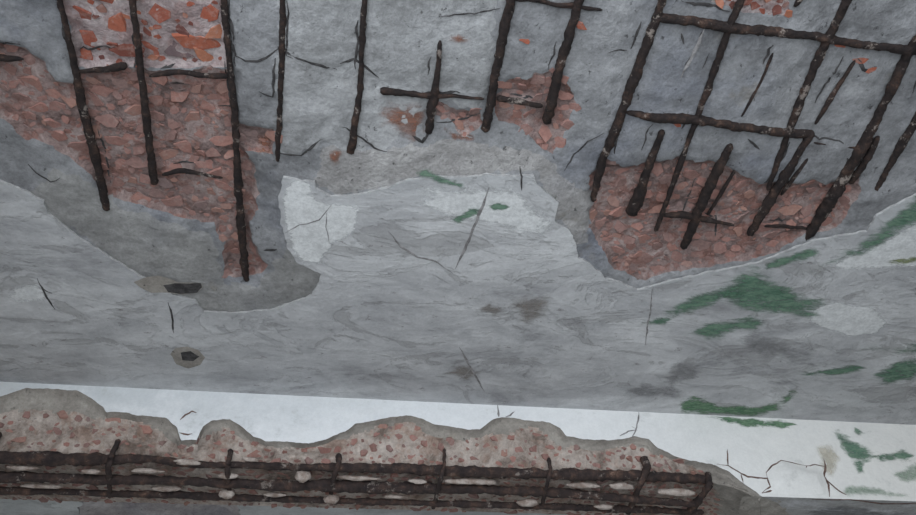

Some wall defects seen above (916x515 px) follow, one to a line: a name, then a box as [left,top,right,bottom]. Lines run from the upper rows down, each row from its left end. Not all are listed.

rust [383,110,421,136]
spalling [0,0,916,312]
leakage [767,249,817,269]
leakage [649,286,741,324]
leakage [696,317,761,337]
peeling [810,302,886,336]
leakage [806,365,864,375]
leakage [875,361,916,384]
leakage [720,417,796,428]
spalling [0,388,792,515]
crack [719,449,916,505]
leakage [874,450,916,479]